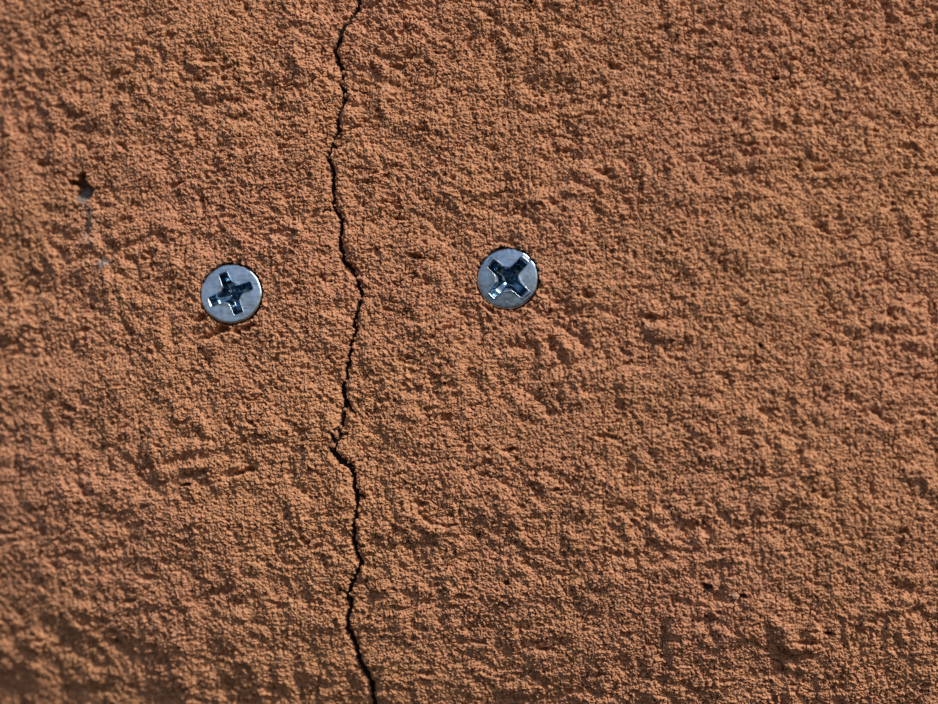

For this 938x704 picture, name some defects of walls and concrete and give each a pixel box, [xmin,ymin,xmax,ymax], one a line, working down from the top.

spalling [72,173,95,202]
crack [322,0,378,704]